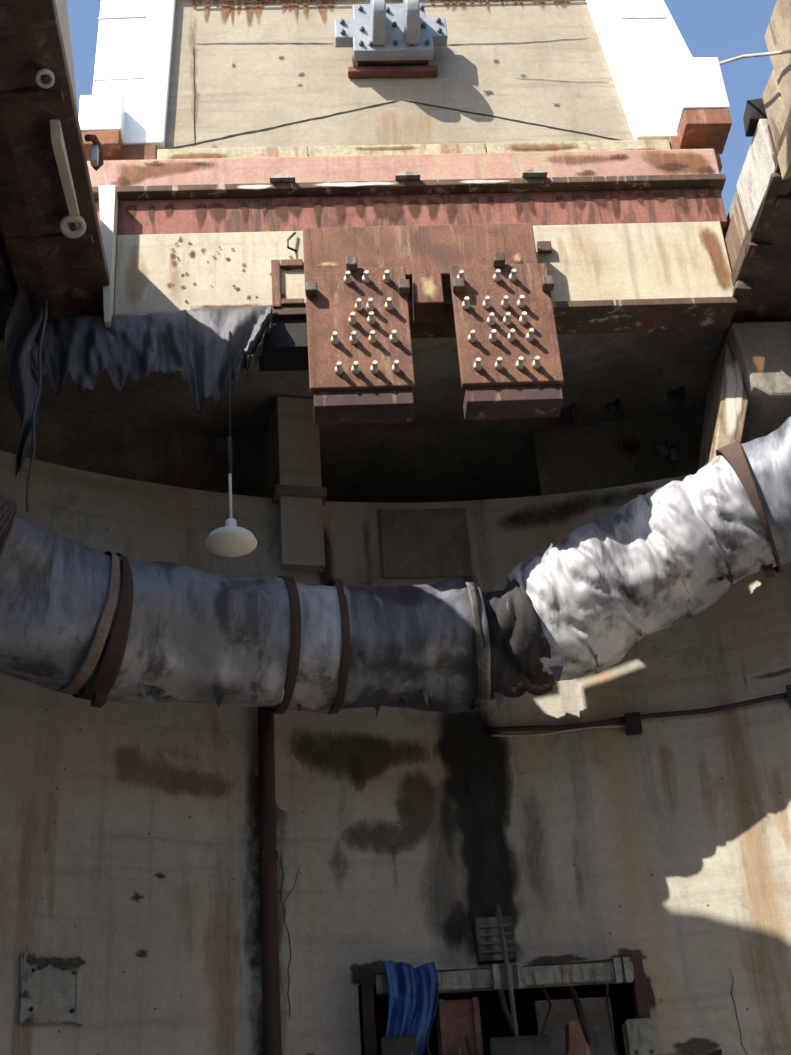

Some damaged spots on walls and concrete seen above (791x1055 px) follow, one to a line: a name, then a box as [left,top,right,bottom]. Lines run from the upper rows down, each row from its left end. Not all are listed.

rust [192,0,334,23]
rust [509,144,713,175]
rust [556,195,619,217]
rust [637,193,718,212]
leakage [292,733,425,790]
leakage [347,709,519,955]
crack [729,969,747,1055]